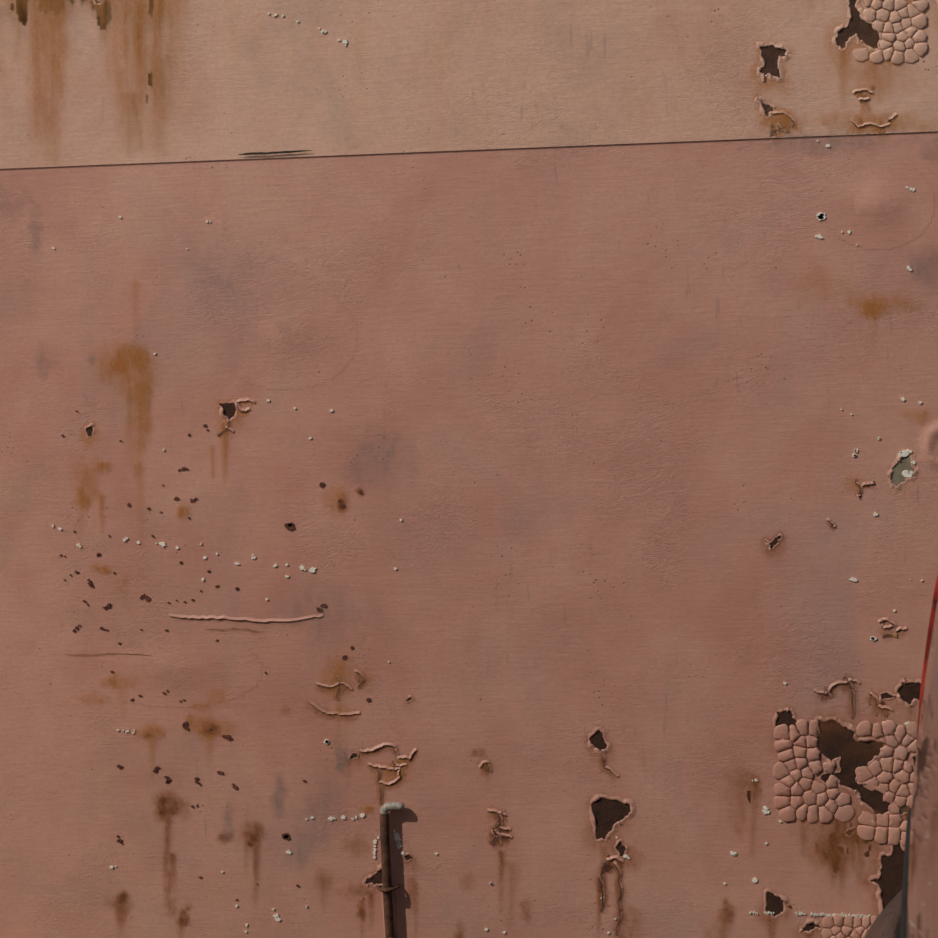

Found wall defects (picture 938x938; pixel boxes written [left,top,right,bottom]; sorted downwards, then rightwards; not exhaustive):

peeling [755,41,791,83]
peeling [754,94,777,121]
peeling [886,449,920,491]
peeling [878,677,921,709]
peeling [587,726,612,756]
corrosion [157,796,198,874]
peeling [589,794,636,859]
peeling [762,706,917,938]
peeling [752,878,789,922]